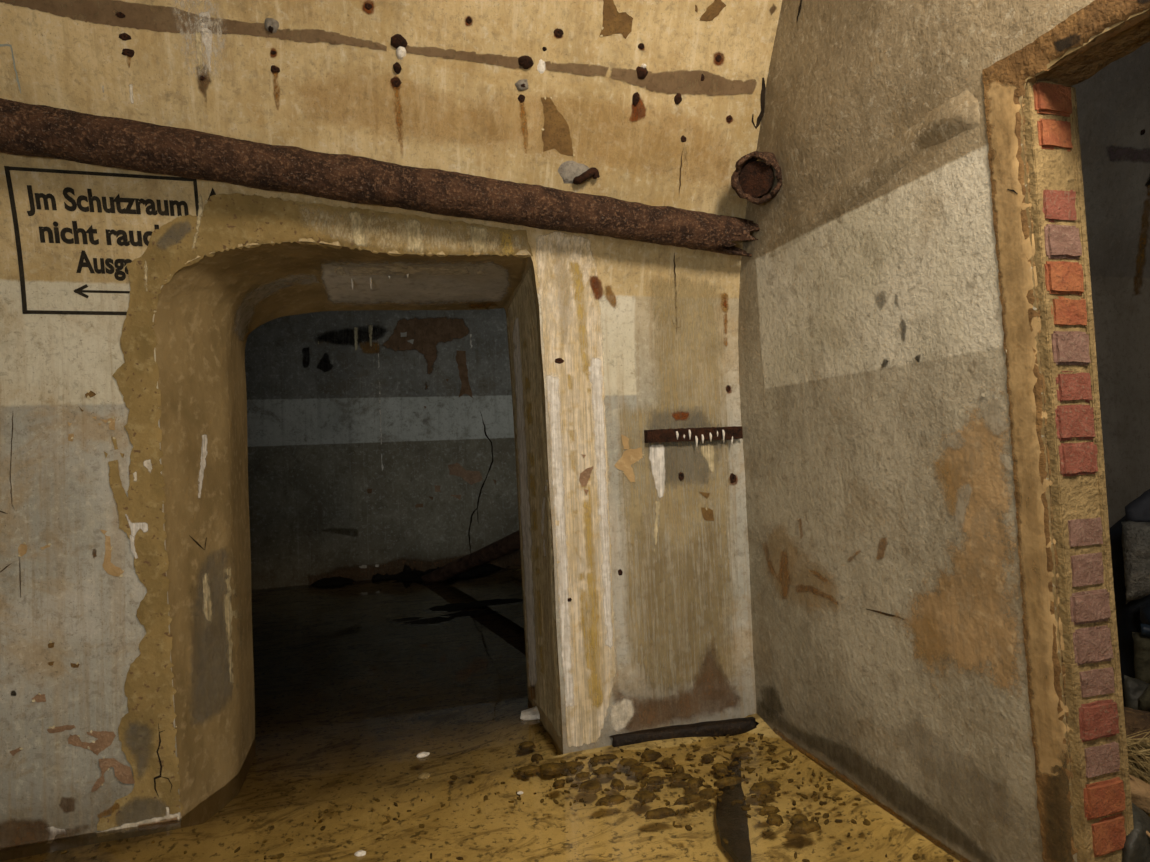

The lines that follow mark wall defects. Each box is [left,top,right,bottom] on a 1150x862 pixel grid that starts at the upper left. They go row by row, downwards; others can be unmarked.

peeling [599,0,633,39]
peeling [695,0,726,21]
corrosion [270,48,280,109]
corrosion [391,77,402,144]
peeling [541,97,575,156]
spalling [895,0,1150,862]
peeling [47,193,533,833]
crack [468,412,493,553]